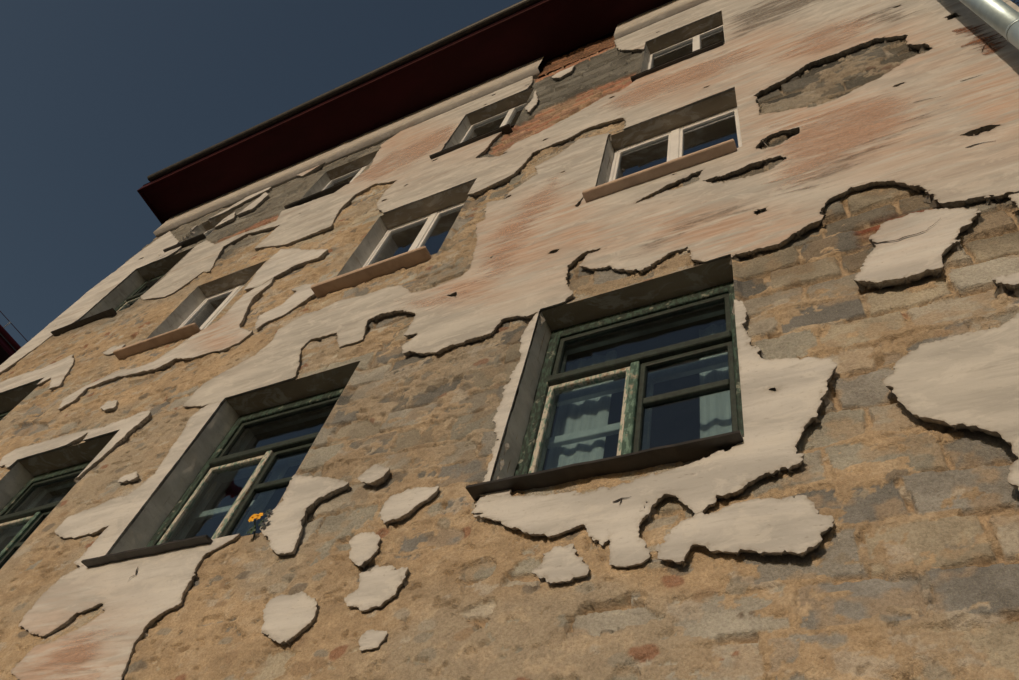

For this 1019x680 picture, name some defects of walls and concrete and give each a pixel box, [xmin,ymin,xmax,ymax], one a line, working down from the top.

spalling [481,35,645,158]
spalling [757,38,930,114]
spalling [668,174,700,190]
spalling [712,158,783,183]
spalling [760,134,797,149]
spalling [0,120,626,680]
spalling [123,185,1019,680]